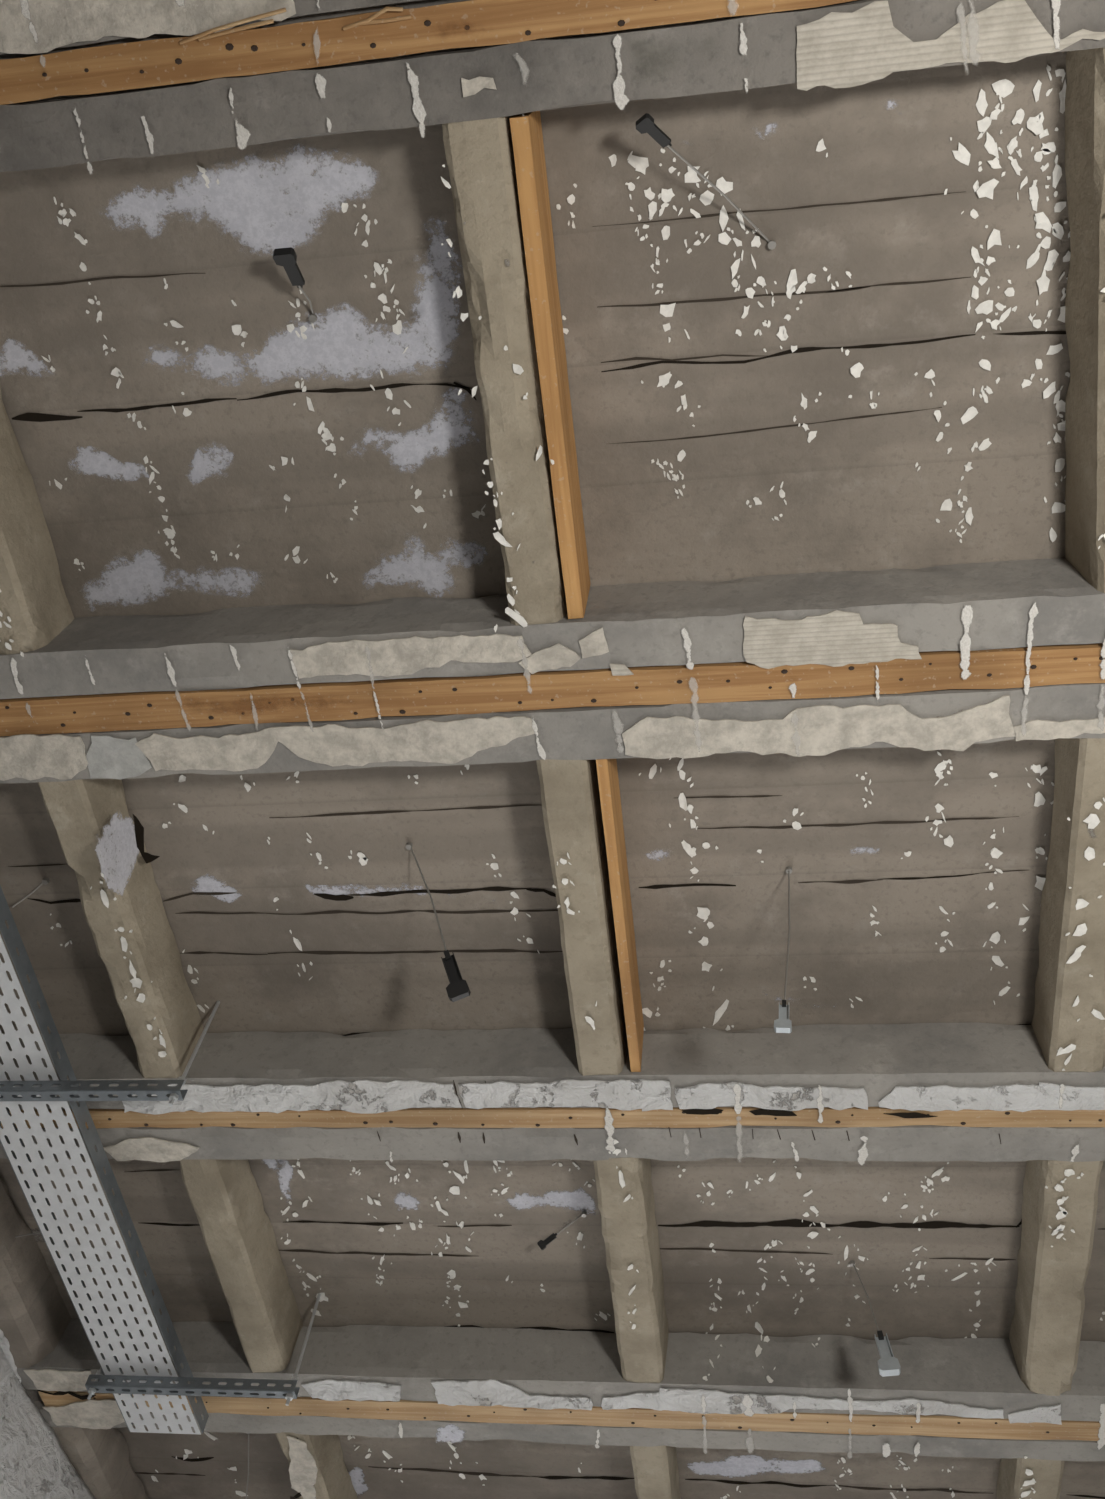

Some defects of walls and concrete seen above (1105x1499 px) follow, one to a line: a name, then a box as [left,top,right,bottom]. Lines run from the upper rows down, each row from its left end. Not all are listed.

damp [105,88,375,253]
damp [146,219,460,385]
crack [601,331,1066,372]
crack [12,382,477,422]
damp [353,388,479,471]
damp [71,446,149,481]
damp [84,550,258,611]
crack [163,886,558,915]
crack [184,948,563,956]
peeling [510,891,539,953]
crack [658,1219,1022,1261]
flaking render [0,1329,30,1395]